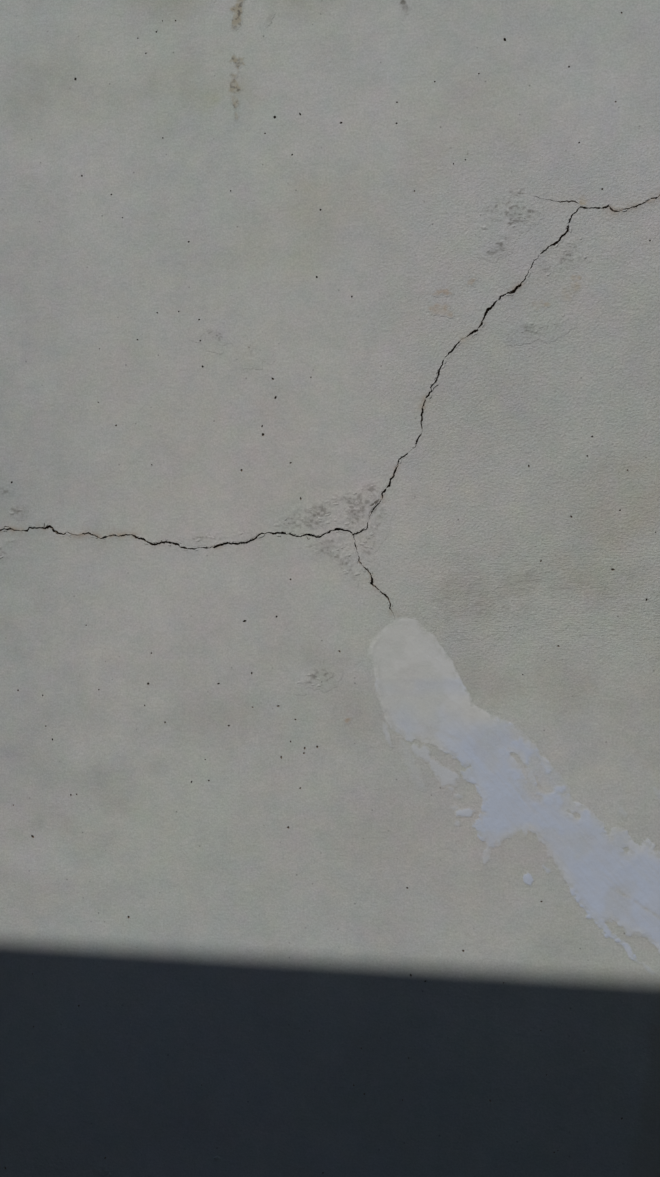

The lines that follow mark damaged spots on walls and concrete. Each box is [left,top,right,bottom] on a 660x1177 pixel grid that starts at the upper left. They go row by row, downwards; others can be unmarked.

crack [0,195,660,617]